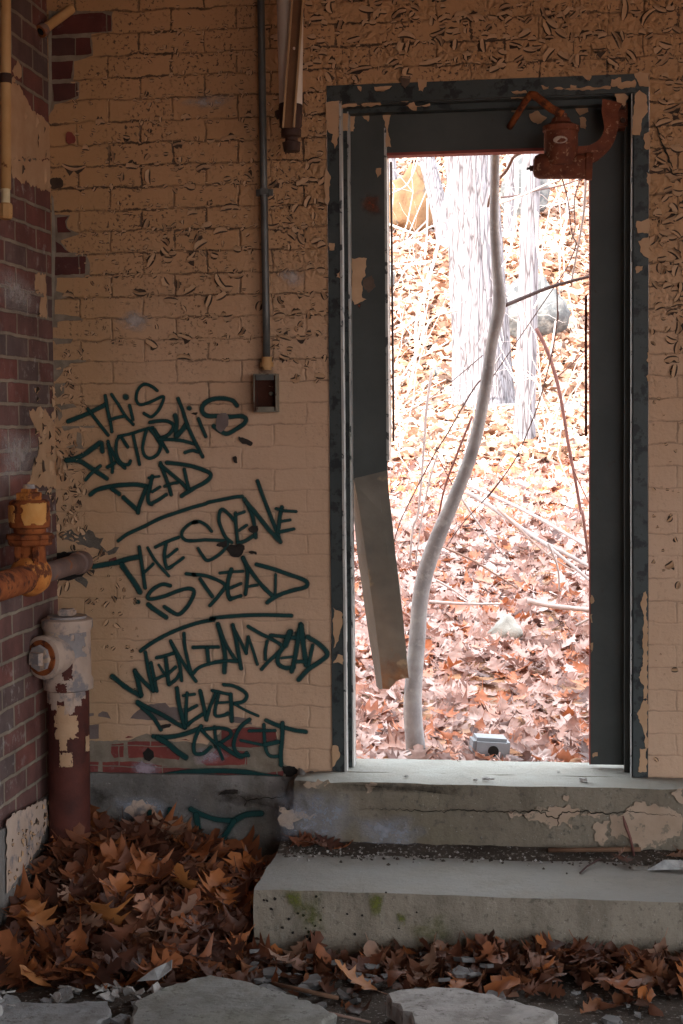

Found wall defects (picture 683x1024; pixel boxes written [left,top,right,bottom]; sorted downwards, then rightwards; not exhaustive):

peeling [11,0,683,683]
peeling [637,592,662,773]
flaking render [89,703,333,789]
peeling [331,745,340,767]
peeling [6,799,49,893]
peeling [278,807,316,830]
crack [358,808,675,826]
peeling [508,789,683,850]